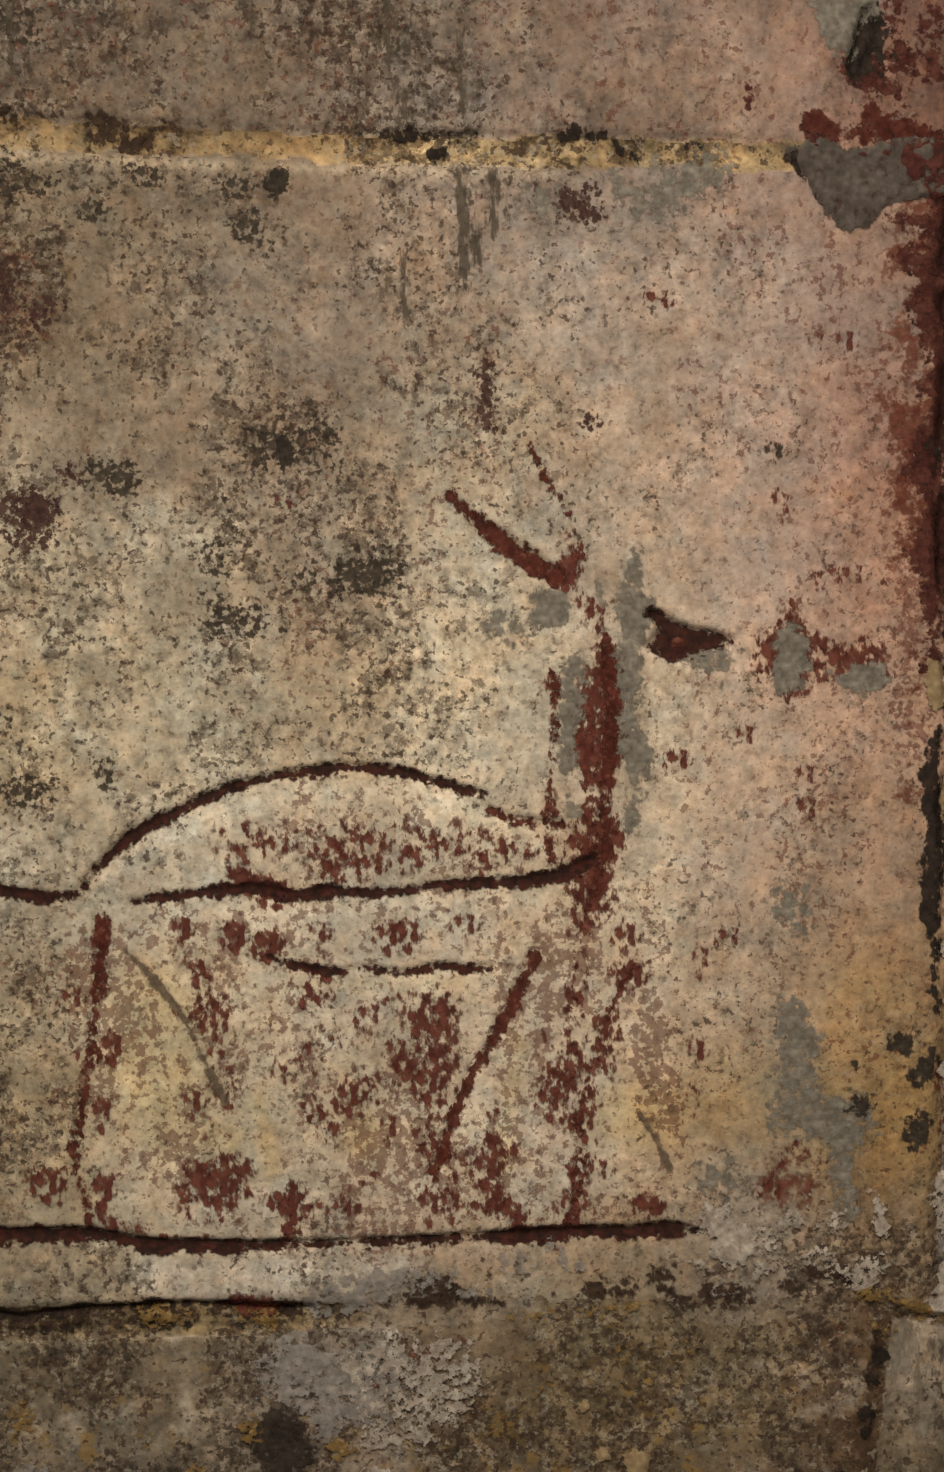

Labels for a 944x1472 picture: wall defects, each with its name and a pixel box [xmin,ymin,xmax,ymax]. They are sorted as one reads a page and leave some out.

crack [381,1272,506,1311]
crack [0,1295,324,1337]
crack [551,1261,891,1472]